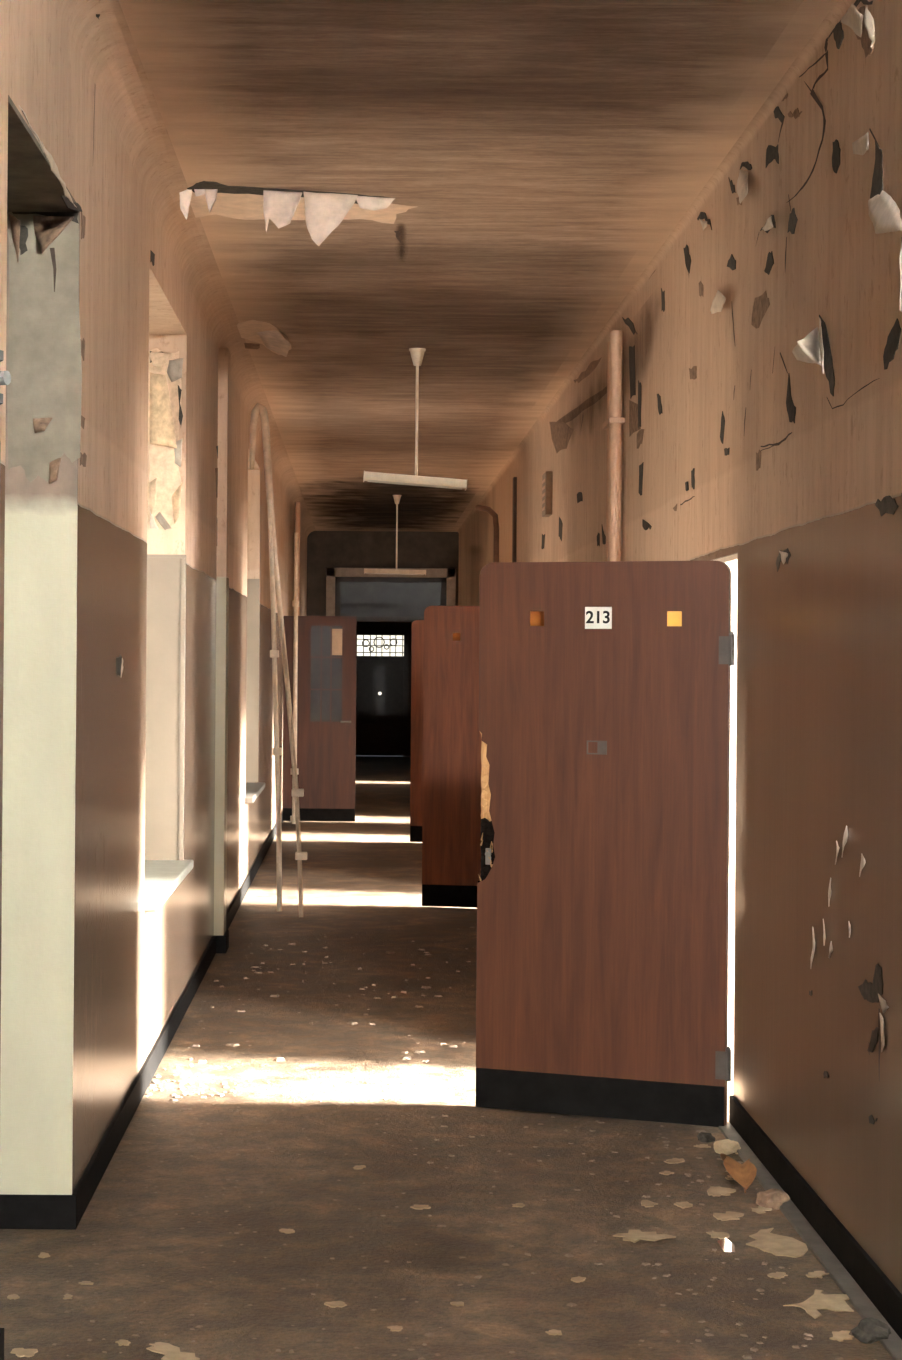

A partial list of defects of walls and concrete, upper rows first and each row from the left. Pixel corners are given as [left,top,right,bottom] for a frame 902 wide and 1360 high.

peeling [728,93,802,205]
crack [788,20,841,202]
peeling [180,181,418,246]
peeling [683,245,726,314]
peeling [756,194,798,275]
peeling [832,129,902,370]
peeling [147,348,183,530]
spalling [622,317,662,496]
peeling [673,468,695,511]
peeling [720,411,730,456]
peeling [772,315,835,423]
peeling [858,964,889,1075]